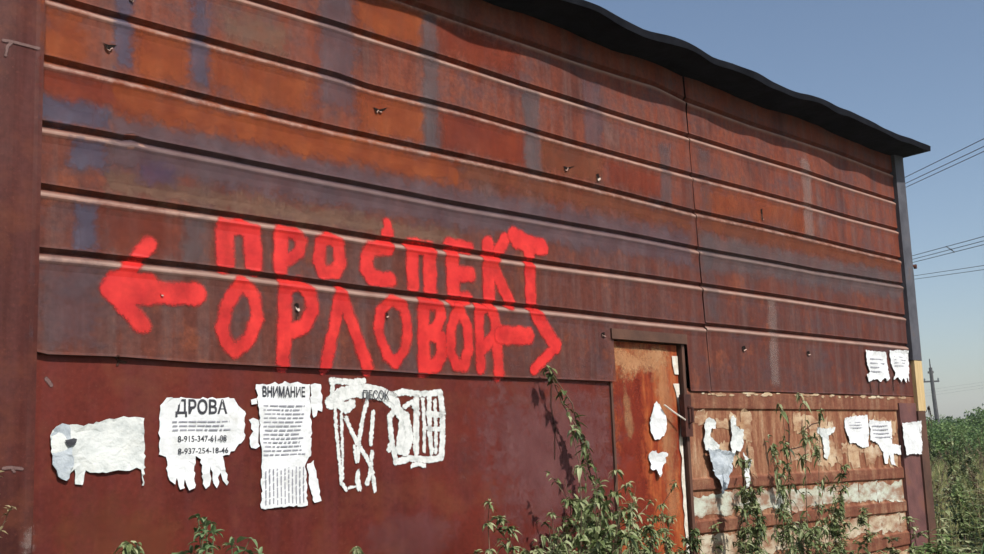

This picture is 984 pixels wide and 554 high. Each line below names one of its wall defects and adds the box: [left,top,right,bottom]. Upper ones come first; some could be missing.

rust [42,0,900,271]
rust [613,348,667,534]
peeling [693,408,907,554]